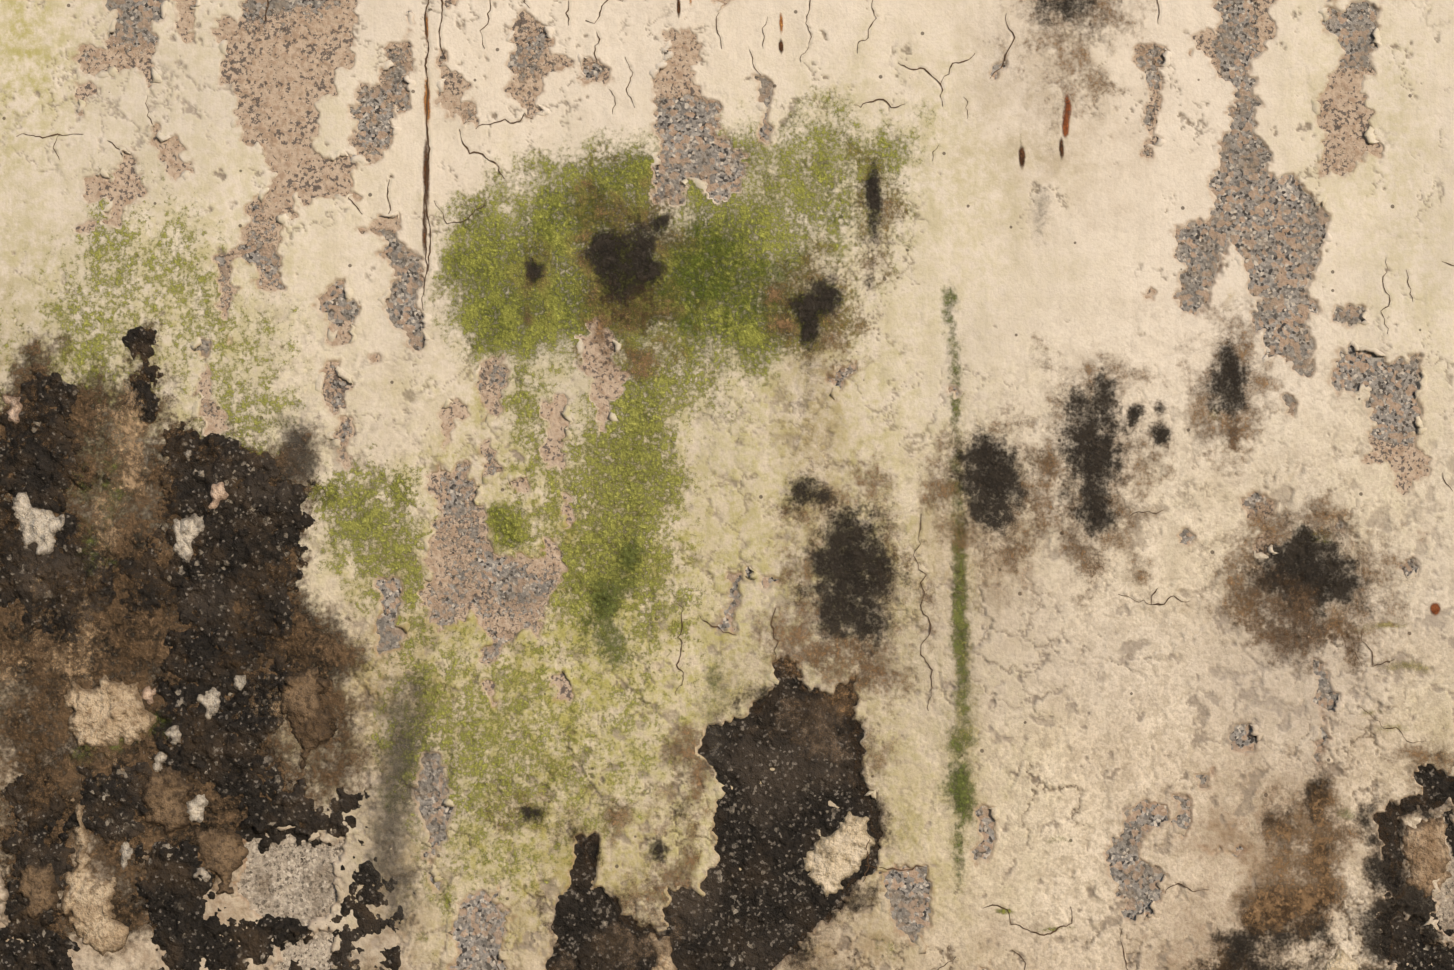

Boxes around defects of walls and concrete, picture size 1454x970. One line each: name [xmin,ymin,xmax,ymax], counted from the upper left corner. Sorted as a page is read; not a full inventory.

peeling [73,0,201,116]
peeling [212,0,416,319]
peeling [358,211,433,351]
crack [346,0,532,308]
crack [566,0,635,113]
peeling [649,29,748,205]
peeling [1132,0,1431,495]
leakage [0,322,424,970]
leakage [537,467,910,970]
leakage [922,364,1171,582]
leakage [1223,495,1406,670]
leakage [1193,746,1454,970]